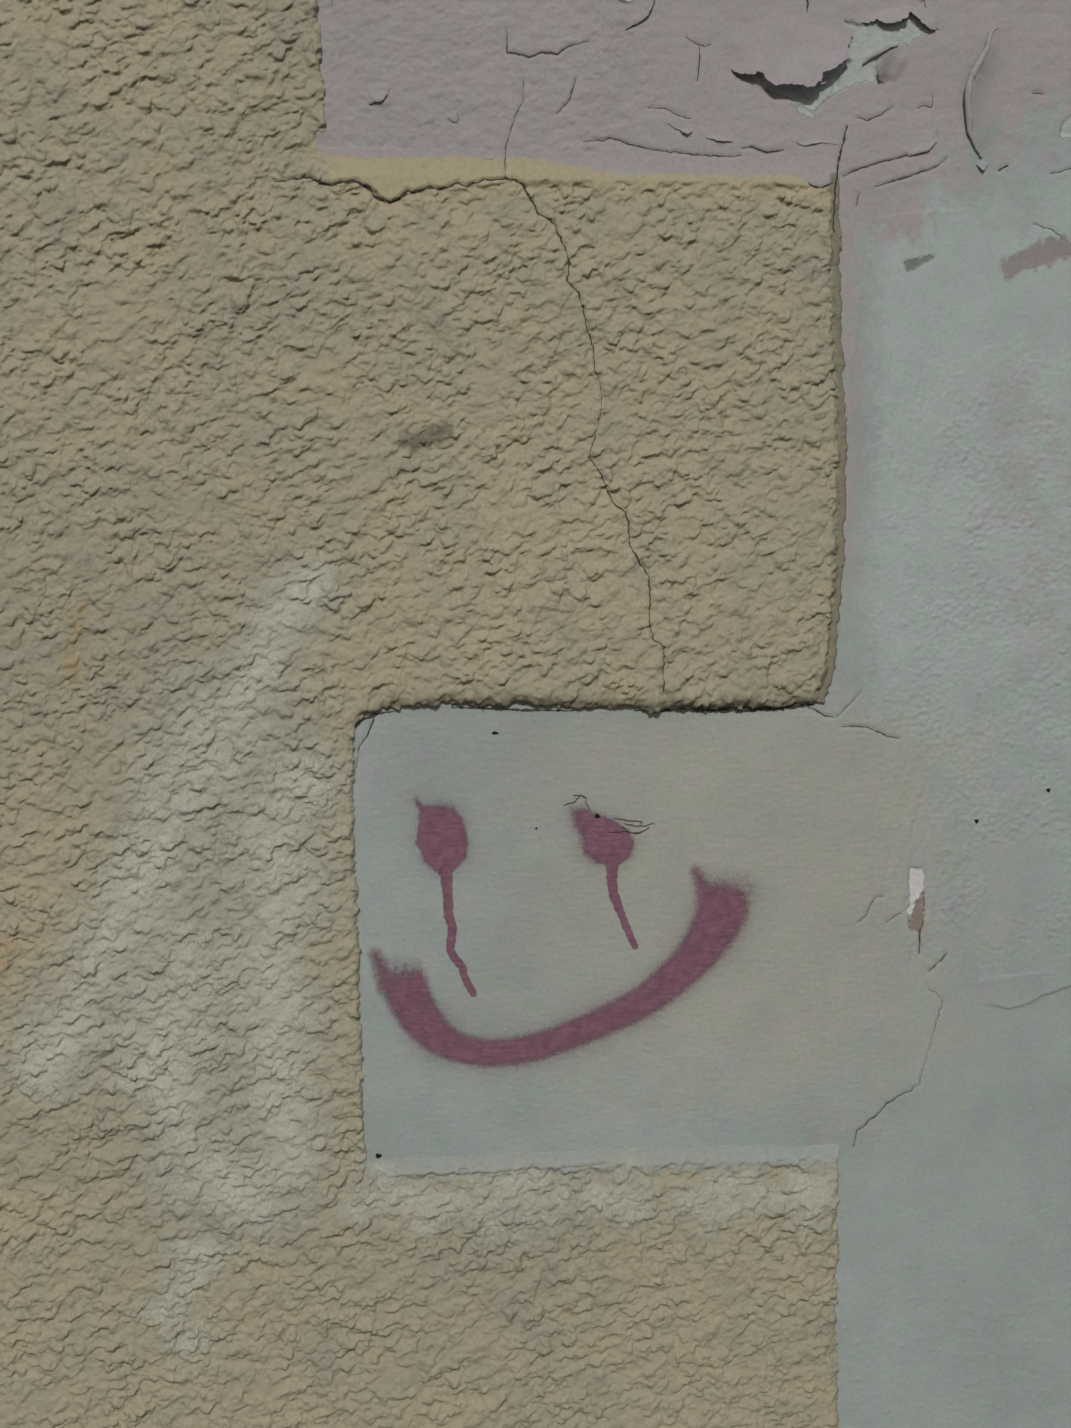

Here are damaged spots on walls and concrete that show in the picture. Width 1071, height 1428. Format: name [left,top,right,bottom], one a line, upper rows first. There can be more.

peeling [705,3,941,119]
crack [809,101,947,233]
spalling [904,255,933,271]
crack [274,30,900,739]
crack [355,711,393,768]
flaking render [906,867,925,932]
crack [853,896,947,1146]